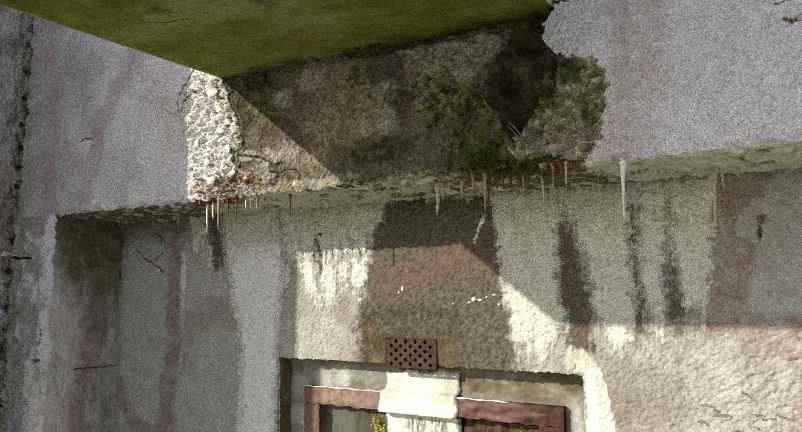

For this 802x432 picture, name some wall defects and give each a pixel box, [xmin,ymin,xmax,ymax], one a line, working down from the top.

crack [0,31,34,271]
crack [74,363,117,371]
crack [137,233,166,264]
rust [187,170,275,198]
spalling [180,0,610,202]
damp [179,173,718,432]